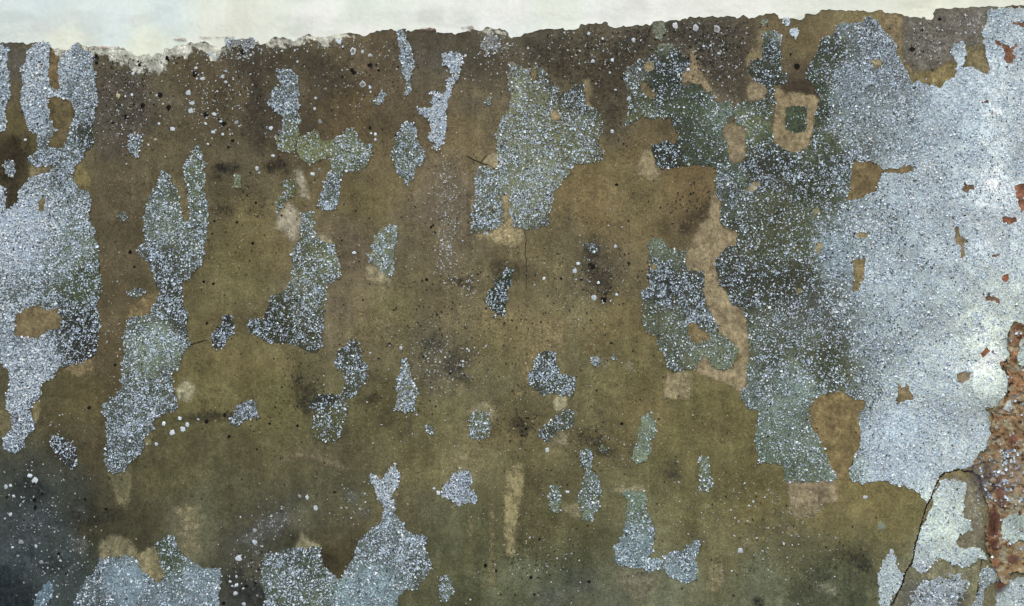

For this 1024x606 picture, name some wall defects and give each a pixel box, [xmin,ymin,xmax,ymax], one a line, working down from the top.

peeling [468,26,506,57]
peeling [470,61,605,248]
peeling [101,144,210,511]
peeling [0,34,373,454]
peeling [622,6,1024,606]
peeling [260,463,455,606]
peeling [548,446,702,604]
crack [890,469,981,606]
corrosion [988,477,1019,567]